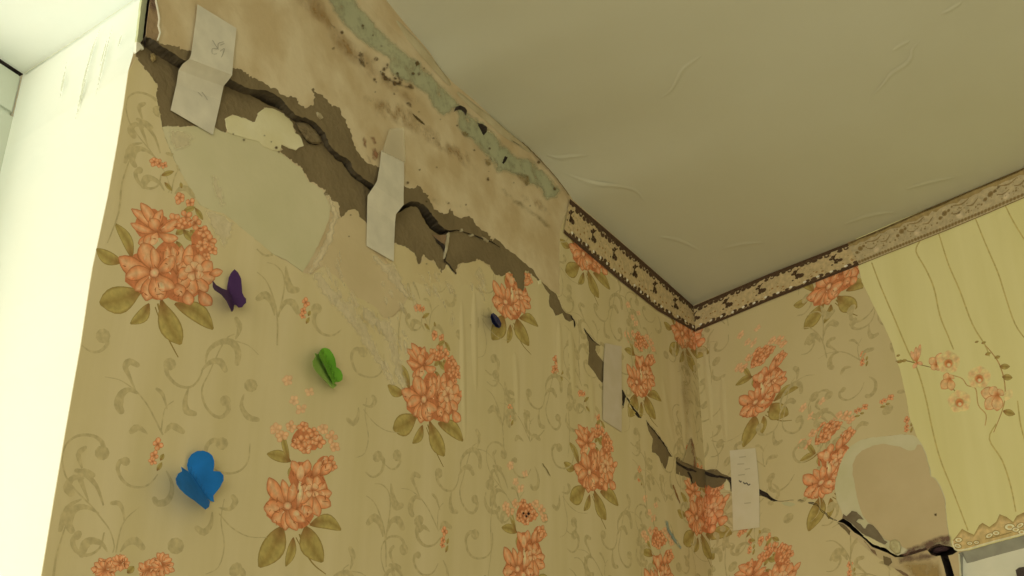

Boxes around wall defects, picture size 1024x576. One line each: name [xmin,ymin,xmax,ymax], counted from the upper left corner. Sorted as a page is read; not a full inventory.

crack [141,0,186,68]
damp [332,31,420,94]
crack [225,79,374,190]
peeling [136,0,559,387]
crack [513,141,569,195]
crack [397,201,499,274]
crack [622,390,732,492]
crack [759,489,928,576]
peeling [835,434,957,576]